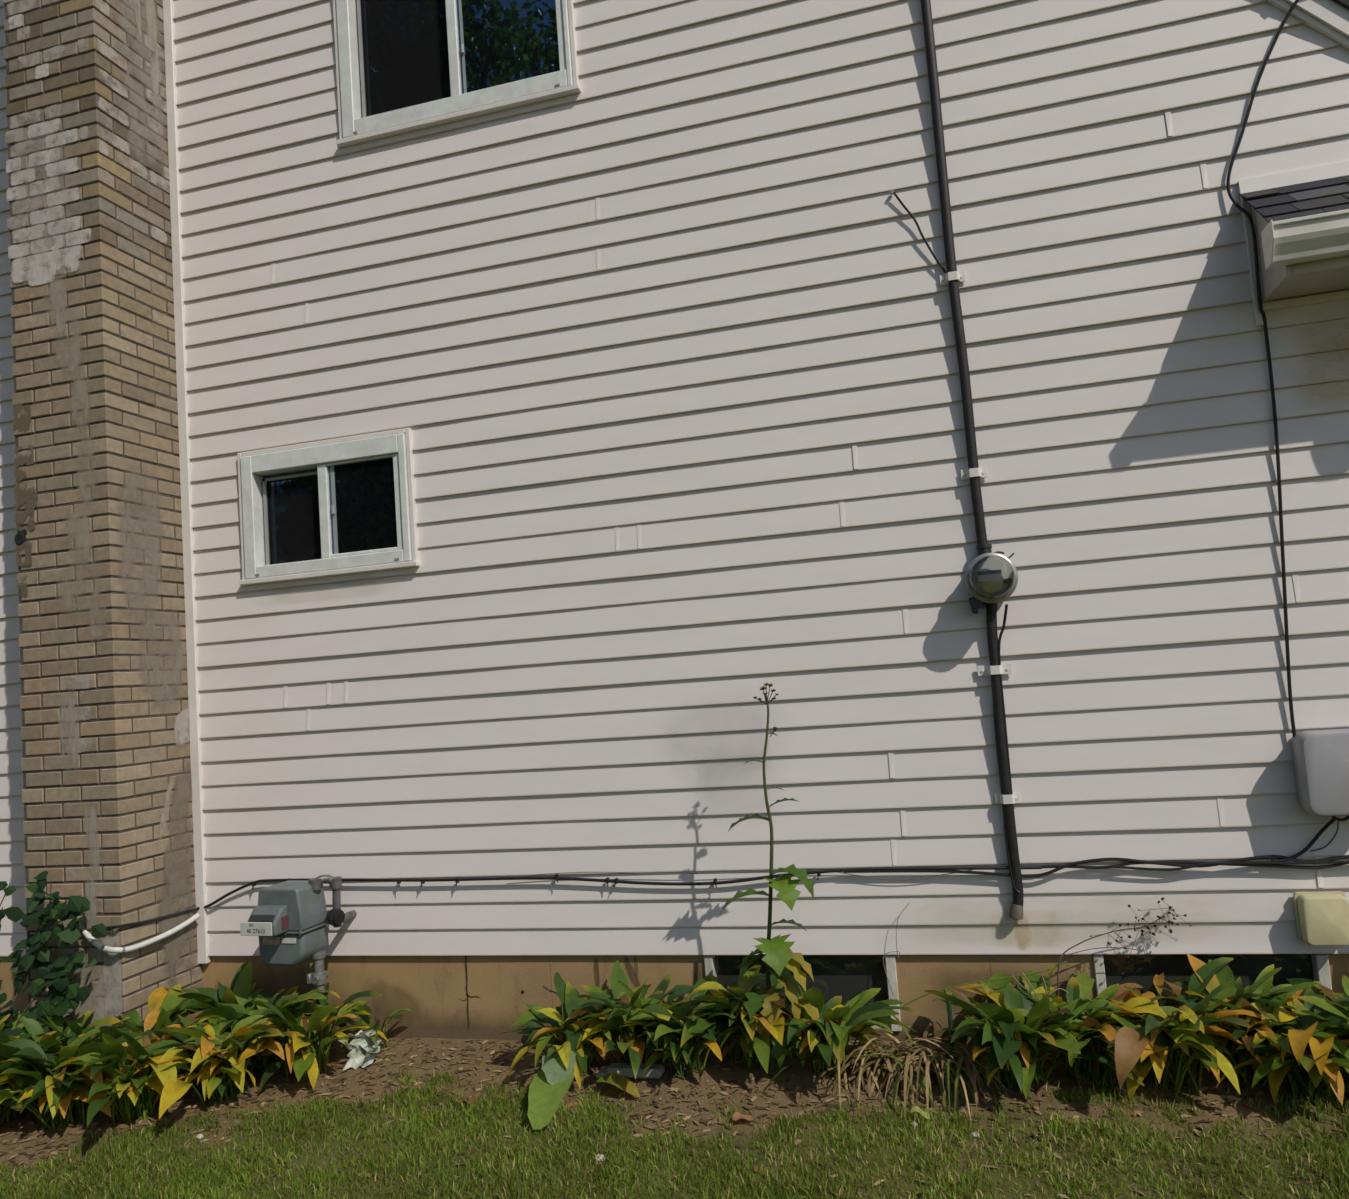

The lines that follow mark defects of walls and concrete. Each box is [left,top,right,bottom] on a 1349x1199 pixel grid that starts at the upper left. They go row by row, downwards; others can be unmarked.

leakage [3,0,173,425]
leakage [63,441,105,638]